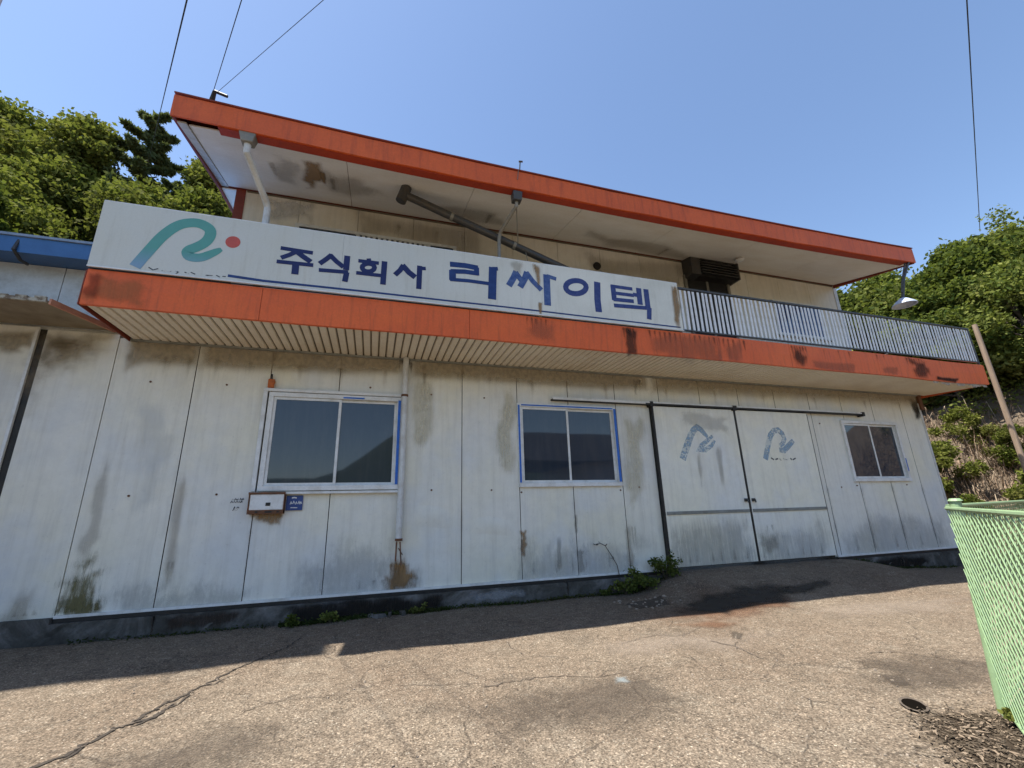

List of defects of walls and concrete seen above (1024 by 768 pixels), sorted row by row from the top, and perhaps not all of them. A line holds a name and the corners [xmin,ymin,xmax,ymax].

corrosion [387,563,413,590]
crack [29,636,303,768]